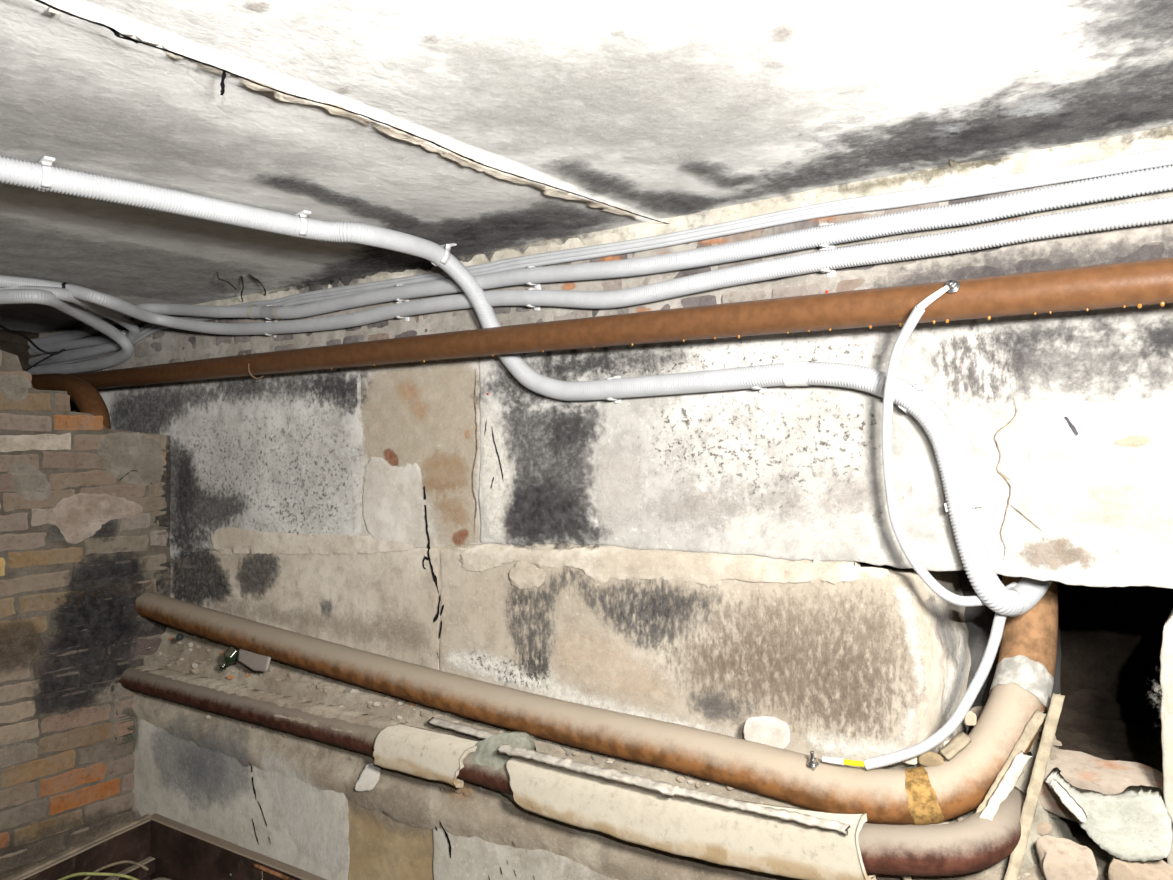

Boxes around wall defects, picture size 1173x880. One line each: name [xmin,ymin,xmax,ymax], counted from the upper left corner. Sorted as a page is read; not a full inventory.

crack [35,0,670,224]
leakage [850,159,1000,190]
leakage [1010,102,1059,116]
leakage [0,222,256,300]
leakage [540,344,791,381]
leakage [112,373,370,631]
crack [422,473,444,659]
leakage [481,371,598,546]
leakage [98,683,137,745]
leakage [446,570,927,758]
leakage [929,593,967,722]